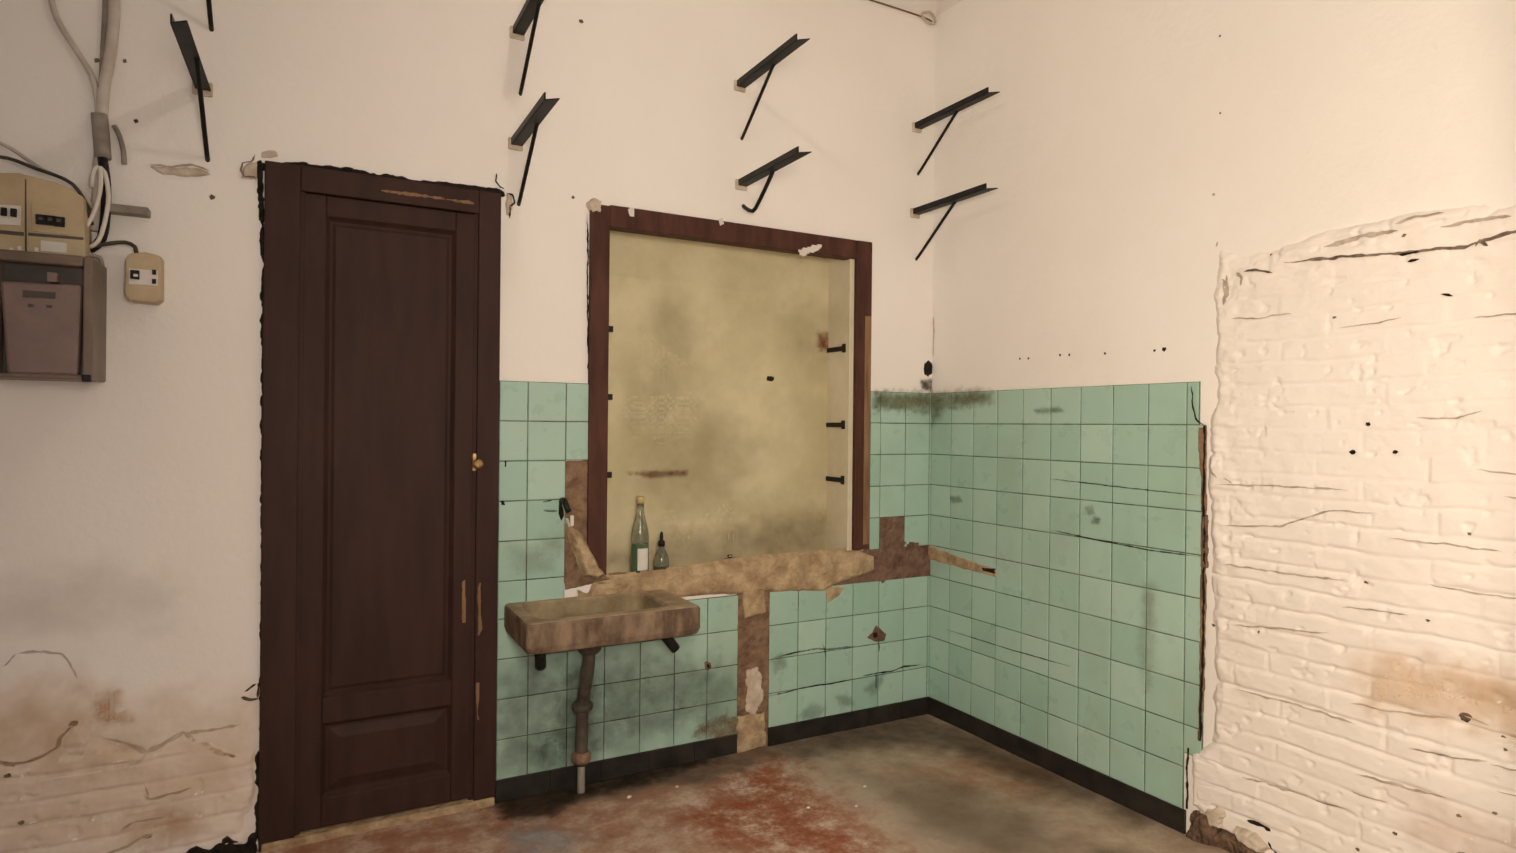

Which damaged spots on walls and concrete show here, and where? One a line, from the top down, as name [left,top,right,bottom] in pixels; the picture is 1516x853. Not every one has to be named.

crack [1216,212,1516,319]
crack [1341,317,1402,328]
spalling [240,150,515,604]
water stain [875,392,986,418]
crack [1416,411,1481,419]
peeling [559,460,610,590]
spalling [826,516,930,602]
flaking render [1186,203,1516,853]
crack [4,650,77,678]
peeling [0,721,259,853]
crack [0,683,260,853]